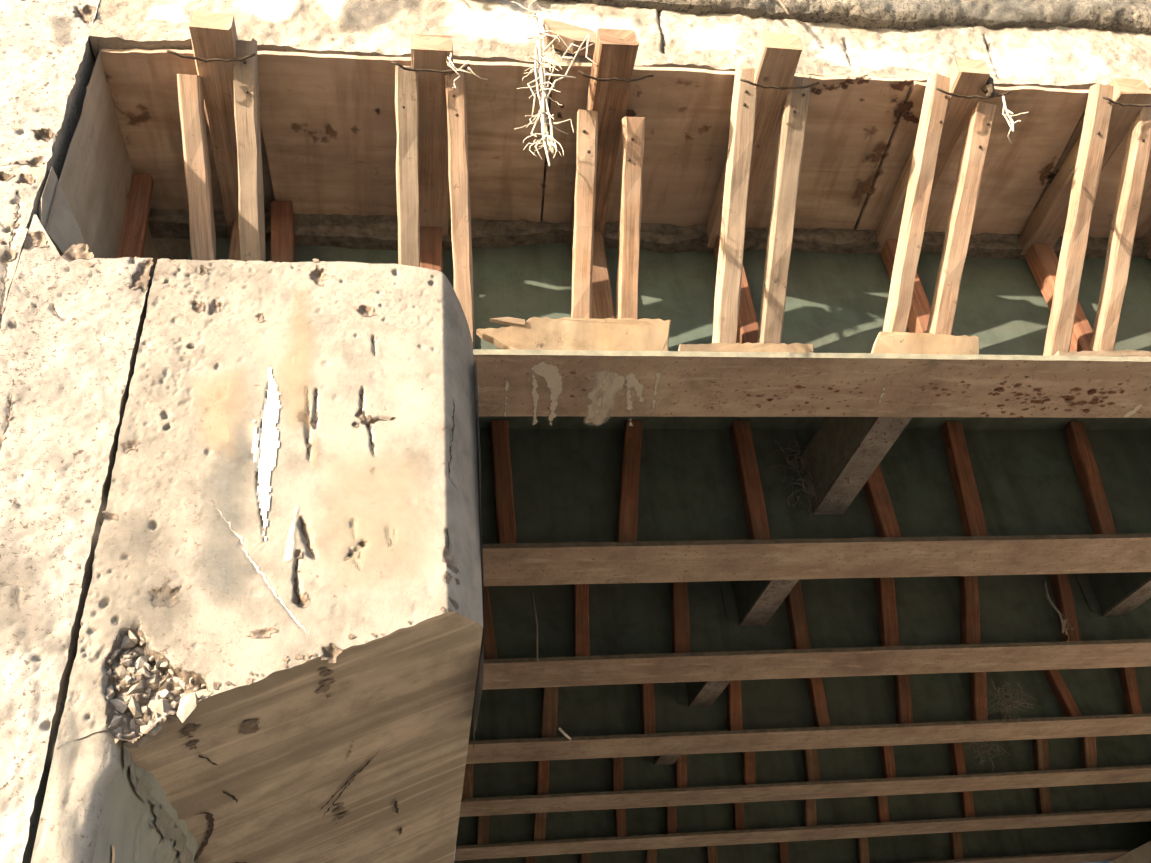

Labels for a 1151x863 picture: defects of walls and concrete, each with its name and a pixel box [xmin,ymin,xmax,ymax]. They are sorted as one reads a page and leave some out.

crack [0,161,27,323]
crack [0,379,14,449]
crack [255,389,268,541]
crack [448,401,456,487]
crack [293,517,316,605]
flaking render [105,630,263,750]